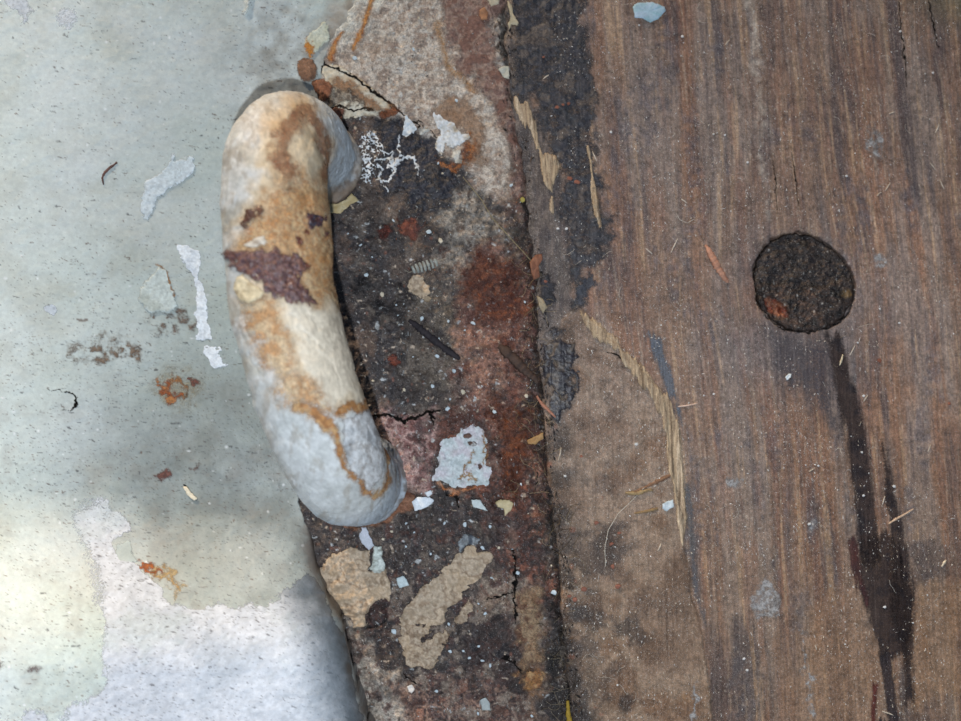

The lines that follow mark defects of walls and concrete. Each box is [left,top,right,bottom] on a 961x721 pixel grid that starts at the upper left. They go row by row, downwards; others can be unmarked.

crack [321,61,437,138]
corrosion [156,375,199,404]
corrosion [220,0,572,721]
peeling [412,424,513,516]
damp [769,325,915,721]
corrosion [139,562,183,597]
peeling [22,497,494,721]